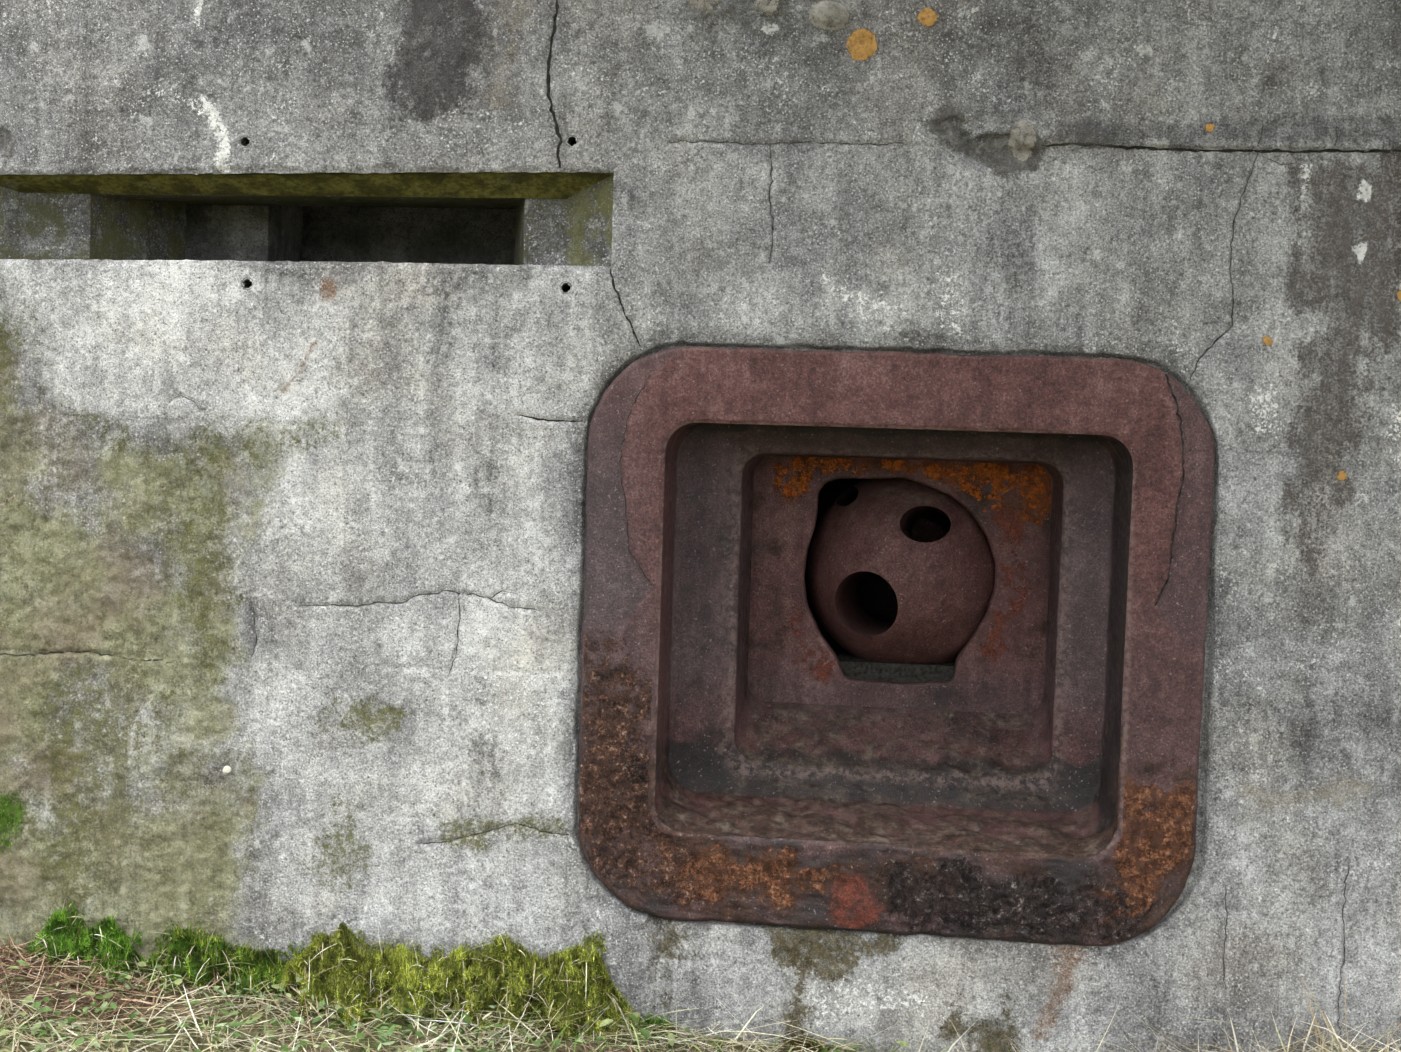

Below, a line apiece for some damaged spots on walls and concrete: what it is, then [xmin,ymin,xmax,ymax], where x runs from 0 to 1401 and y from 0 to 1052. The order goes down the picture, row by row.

efflorescence [193,0,204,26]
damp [382,0,494,129]
efflorescence [156,85,234,173]
crack [670,140,907,264]
damp [0,324,25,404]
crack [1043,121,1401,606]
damp [1057,111,1401,597]
rust [774,457,1051,528]
crack [0,651,171,663]
damp [24,453,242,924]
crack [299,590,539,674]
rust [579,632,1195,1052]